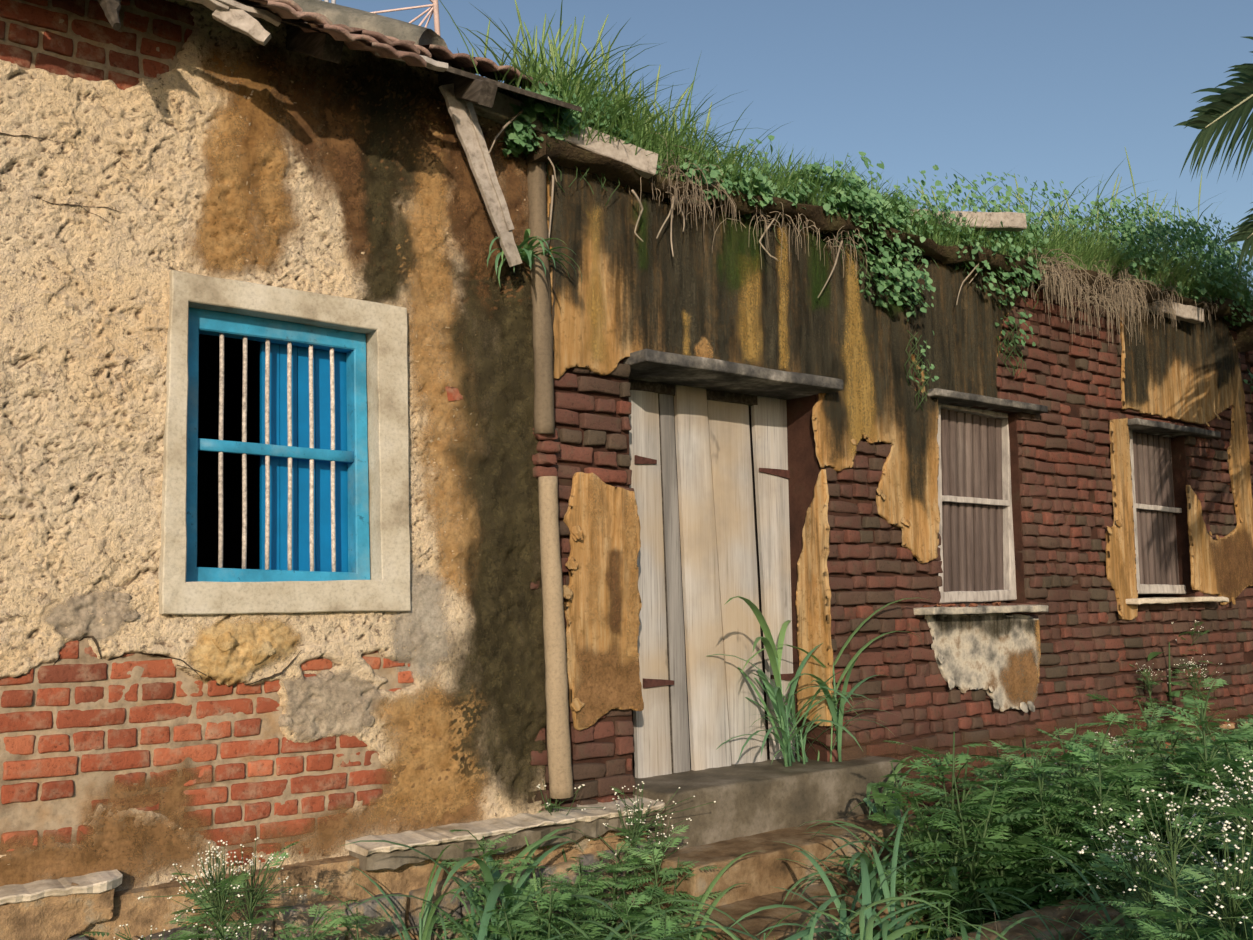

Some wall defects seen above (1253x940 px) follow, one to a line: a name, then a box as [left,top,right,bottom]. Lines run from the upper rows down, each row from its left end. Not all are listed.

spalling [0,0,194,90]
spalling [0,591,414,867]
leakage [195,42,546,757]
flaking render [563,472,644,730]
flaking render [549,185,666,379]
leakage [606,550,621,632]
peeling [695,338,713,358]
leakage [547,163,1021,502]
flaking render [796,313,940,726]
flaking render [925,613,1040,713]
leakage [933,613,1040,639]
flaking render [1106,296,1253,620]